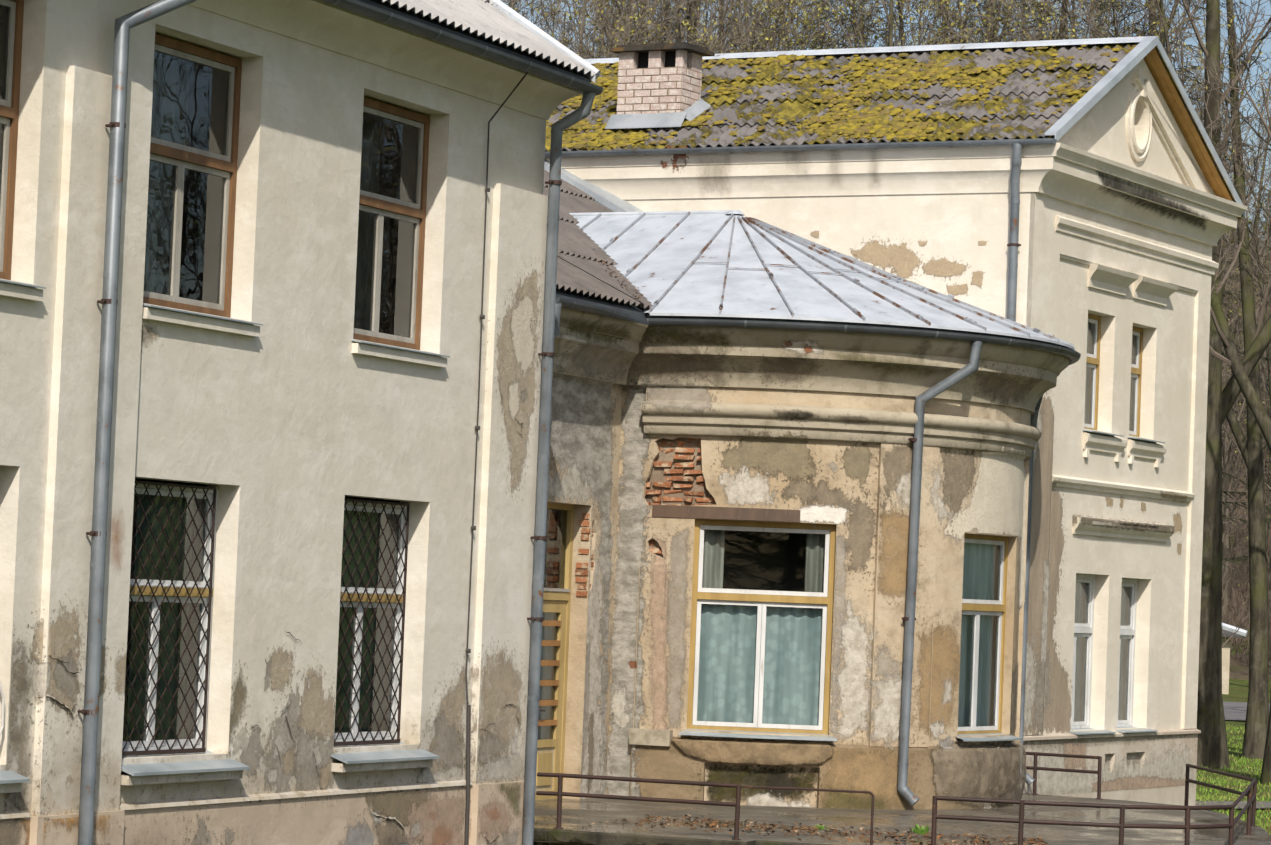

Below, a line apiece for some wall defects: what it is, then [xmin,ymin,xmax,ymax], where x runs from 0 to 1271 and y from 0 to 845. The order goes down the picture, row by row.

flaking render [850,237,985,296]
flaking render [487,265,588,497]
flaking render [645,427,921,605]
flaking render [27,600,87,732]
flaking render [99,646,107,699]
flaking render [231,646,335,799]
flaking render [365,641,526,845]
peeling [547,457,632,799]
peeling [830,600,961,750]
flaking render [928,391,1196,795]
flaking render [186,814,234,845]